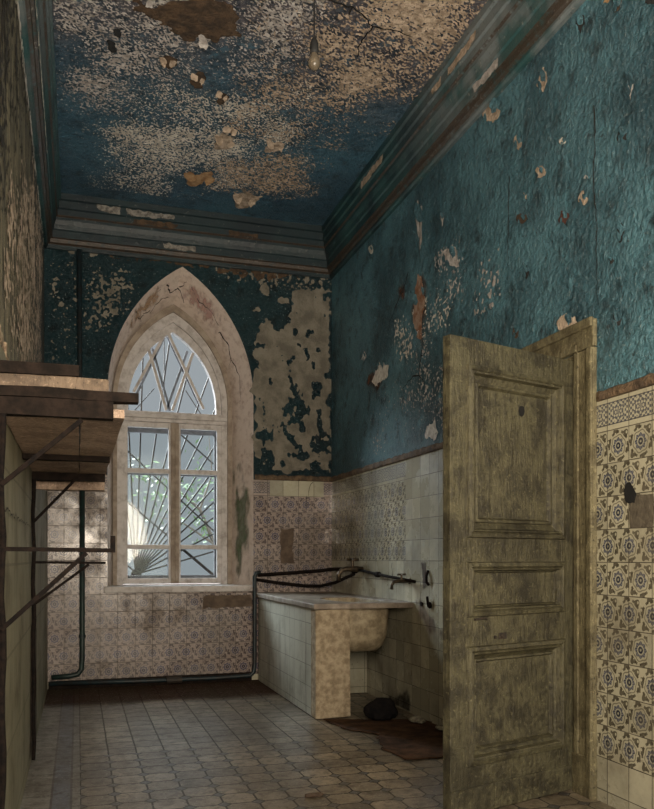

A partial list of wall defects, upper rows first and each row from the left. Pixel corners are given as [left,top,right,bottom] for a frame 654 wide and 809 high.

crack [328,0,411,57]
peeling [53,0,486,209]
peeling [473,58,498,93]
peeling [482,97,500,124]
peeling [536,67,547,93]
peeling [0,0,332,474]
peeling [372,236,502,455]
peeling [624,482,654,528]